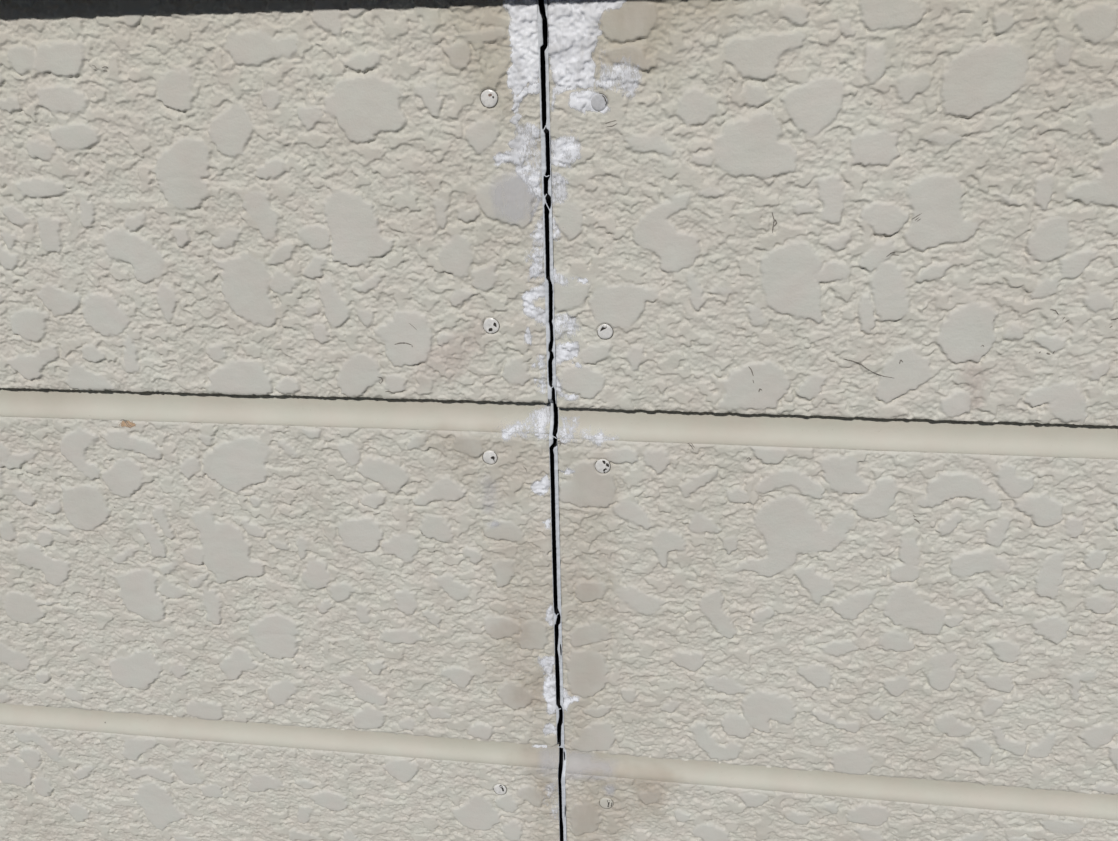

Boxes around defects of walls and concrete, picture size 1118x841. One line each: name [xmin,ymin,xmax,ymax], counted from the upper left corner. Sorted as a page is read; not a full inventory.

crack [538,0,566,841]